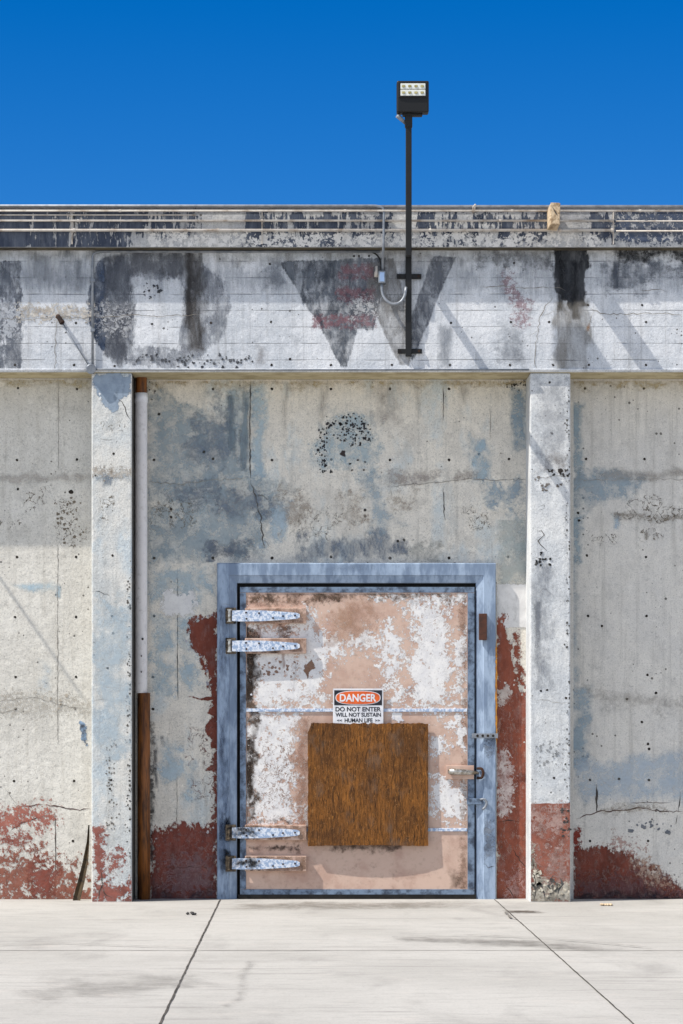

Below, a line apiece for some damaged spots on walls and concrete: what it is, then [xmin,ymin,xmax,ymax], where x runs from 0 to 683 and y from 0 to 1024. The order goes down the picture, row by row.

peeling [147,228,603,247]
damp [538,250,683,368]
crack [150,382,270,548]
peeling [314,413,373,473]
peeling [0,561,132,902]
peeling [150,588,217,899]
peeling [247,594,467,828]
peeling [497,584,683,902]
crack [578,784,681,822]